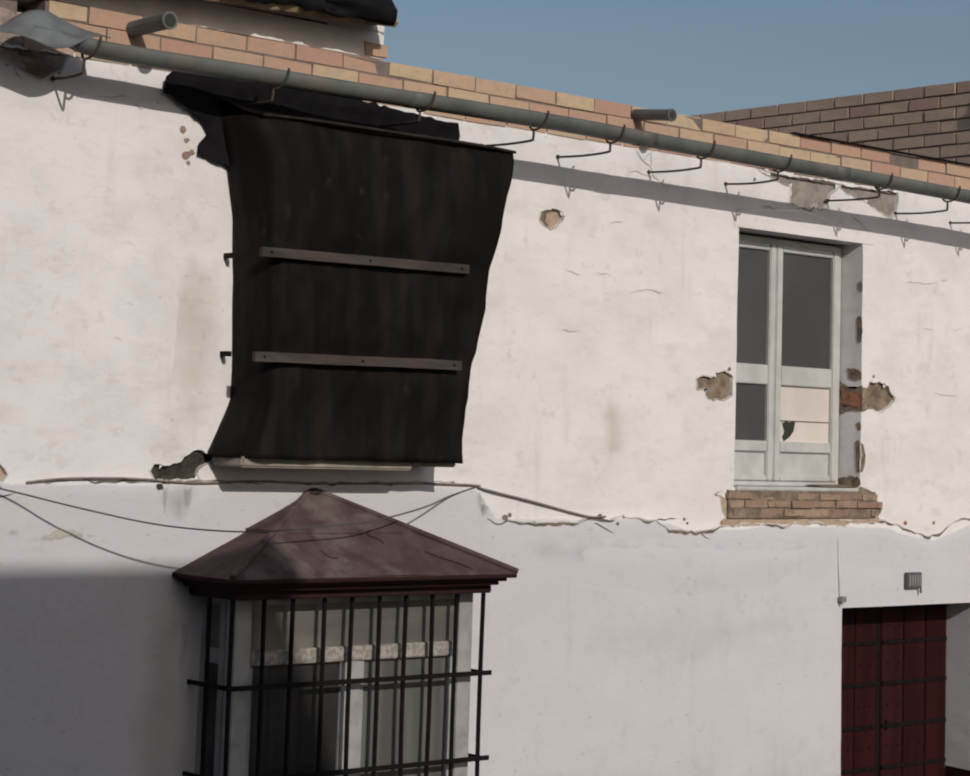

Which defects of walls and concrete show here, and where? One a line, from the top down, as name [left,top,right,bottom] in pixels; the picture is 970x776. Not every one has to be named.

flaking render [0,44,71,81]
flaking render [754,168,899,219]
flaking render [539,208,564,230]
flaking render [695,367,733,401]
flaking render [719,368,895,528]
flaking render [0,463,8,484]
flaking render [148,448,212,490]
crack [489,513,970,539]